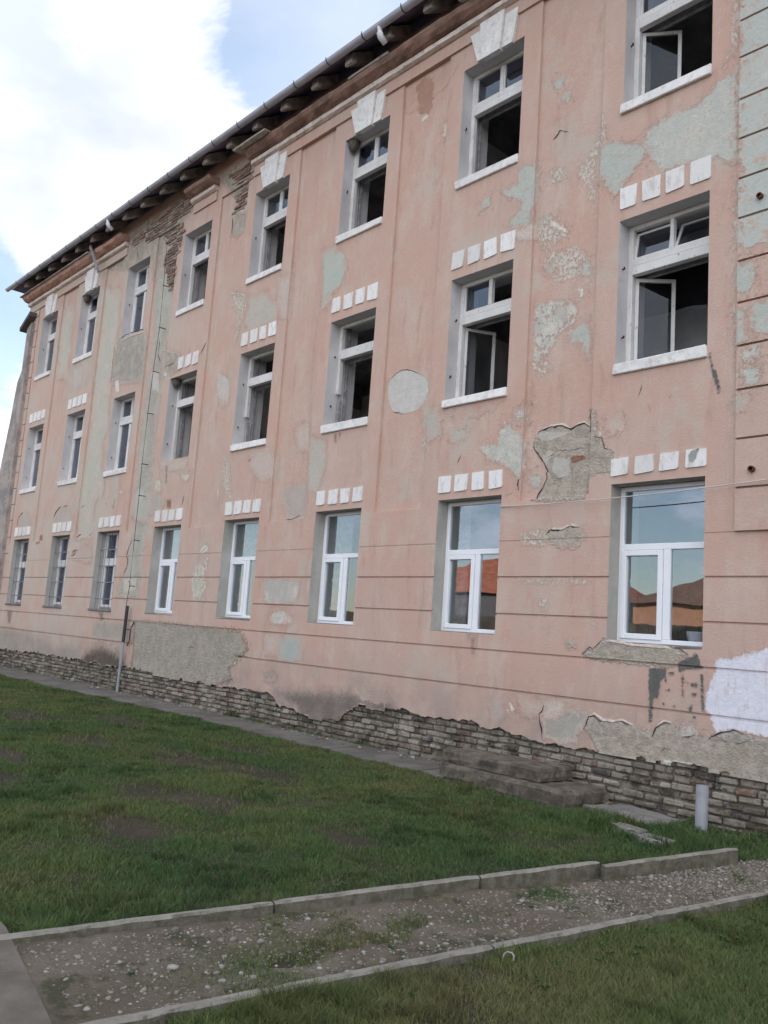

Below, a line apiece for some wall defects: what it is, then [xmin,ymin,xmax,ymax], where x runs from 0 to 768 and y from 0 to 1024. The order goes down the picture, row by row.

flaking render [219,157,255,239]
peeling [475,0,768,419]
peeling [65,194,194,601]
spalling [476,399,629,504]
spalling [519,523,588,551]
flaking render [130,619,249,687]
spalling [564,637,689,669]
damp [647,652,705,723]
spalling [513,688,768,783]